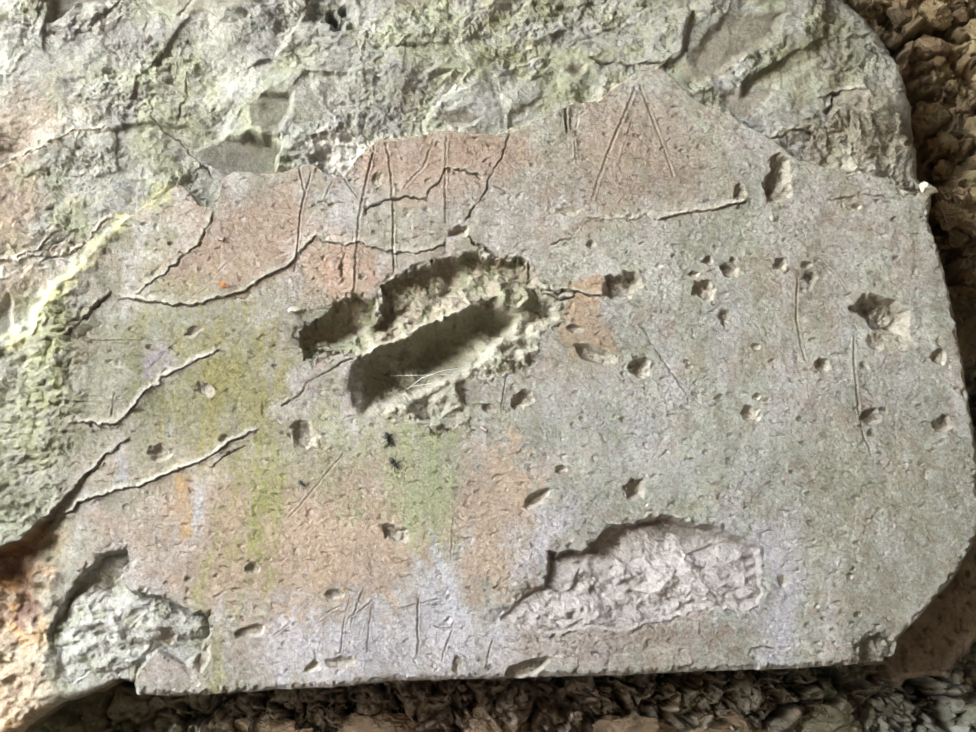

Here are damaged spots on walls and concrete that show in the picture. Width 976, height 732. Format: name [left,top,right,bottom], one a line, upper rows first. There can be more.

crack [0,54,924,337]
crack [34,341,369,525]
spalling [359,298,514,409]
spalling [478,386,538,415]
spalling [44,546,216,687]
spalling [497,513,769,636]
spalling [775,574,789,589]